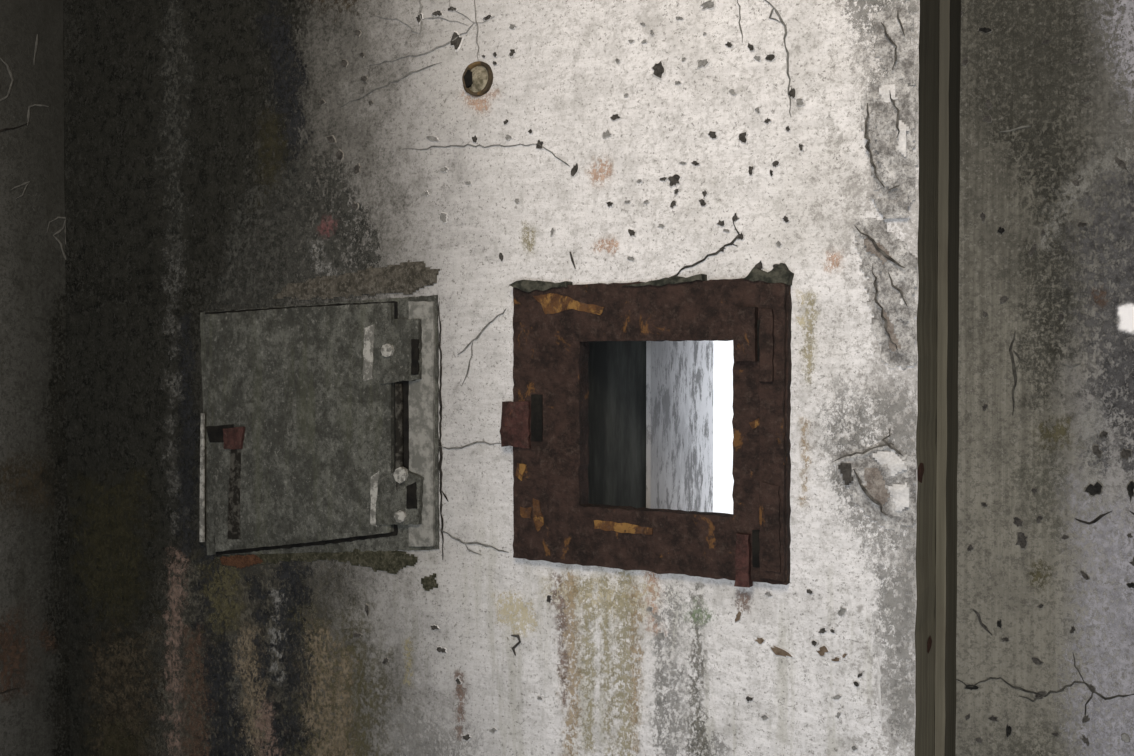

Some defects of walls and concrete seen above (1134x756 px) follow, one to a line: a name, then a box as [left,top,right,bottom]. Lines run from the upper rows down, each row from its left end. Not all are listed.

crack [737,0,791,116]
crack [669,218,740,278]
rust [532,293,605,315]
damp [40,0,466,756]
rust [520,498,544,531]
rust [594,520,653,535]
damp [735,592,751,611]
damp [652,585,728,756]
crack [956,654,1134,717]